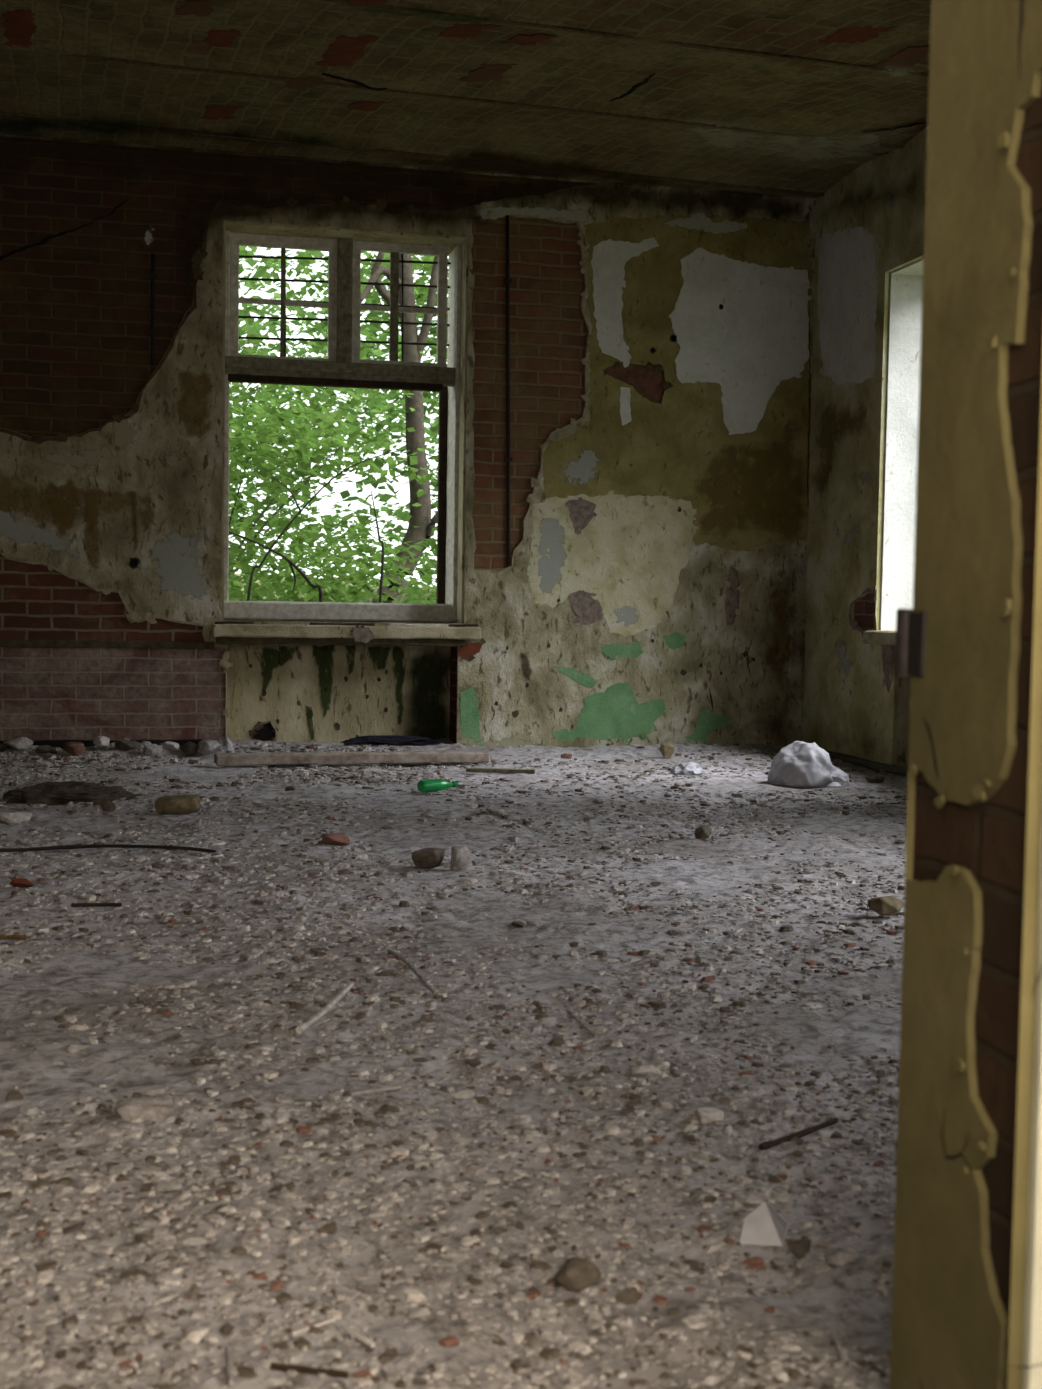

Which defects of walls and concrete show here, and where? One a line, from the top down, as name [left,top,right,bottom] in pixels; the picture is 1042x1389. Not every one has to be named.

peeling [316,35,378,67]
crack [609,74,655,102]
spalling [0,146,878,662]
water stain [697,406,866,538]
spalling [0,553,252,740]
water stain [306,706,314,740]
water stain [345,645,405,724]
peeling [551,666,666,746]
spalling [910,89,1042,1319]